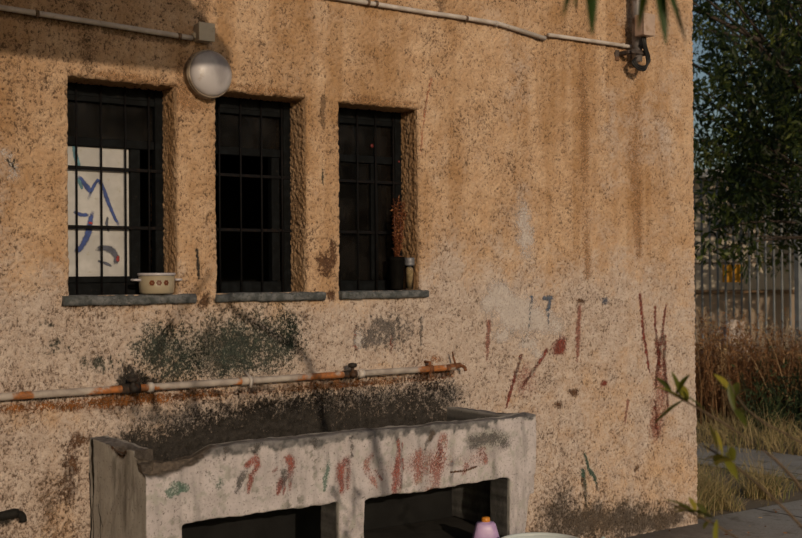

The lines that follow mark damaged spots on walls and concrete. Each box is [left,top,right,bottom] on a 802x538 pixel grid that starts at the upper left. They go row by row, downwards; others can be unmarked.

damp [127,293,309,383]
damp [77,355,123,375]
corrosion [274,356,455,397]
corrosion [1,387,260,418]
damp [110,381,465,461]